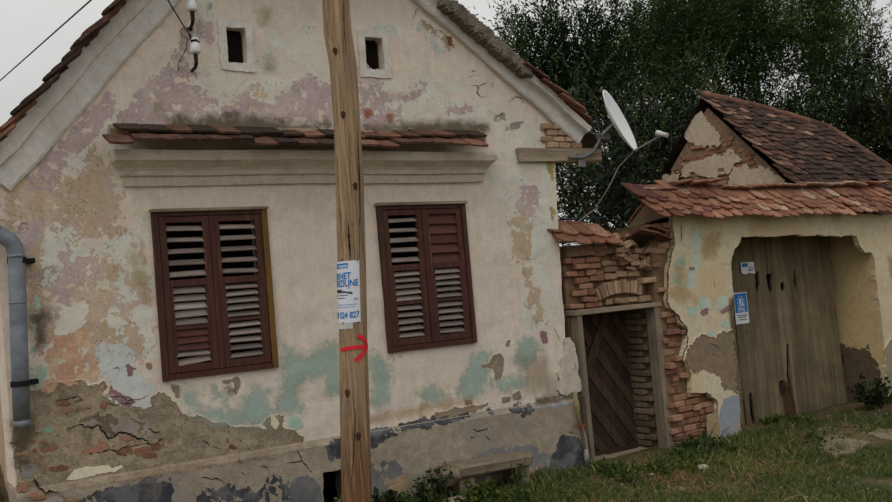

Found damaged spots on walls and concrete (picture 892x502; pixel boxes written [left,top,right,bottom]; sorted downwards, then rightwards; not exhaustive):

flaking render [411,19,455,55]
flaking render [662,111,786,185]
peeling [0,0,341,502]
peeling [357,63,570,449]
water stain [33,312,46,346]
flaking render [671,225,742,439]
flaking render [840,337,892,402]
crack [56,395,164,456]
crack [202,440,268,502]
peeling [371,459,410,501]
peeling [478,434,585,476]